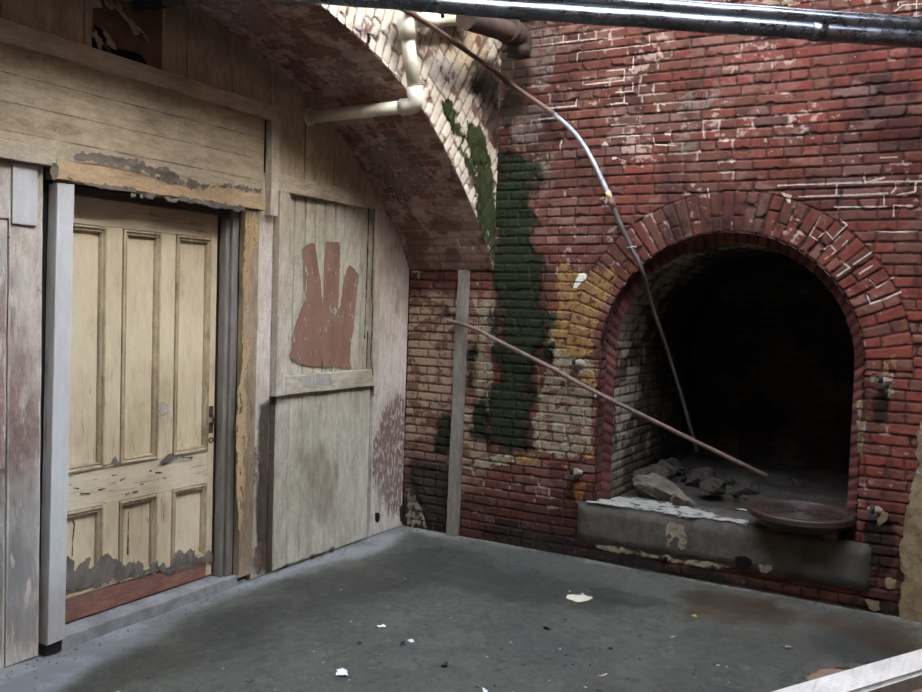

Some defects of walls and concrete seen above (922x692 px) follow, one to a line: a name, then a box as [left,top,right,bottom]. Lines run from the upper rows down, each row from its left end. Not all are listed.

peeling [50,151,262,336]
peeling [66,548,213,591]